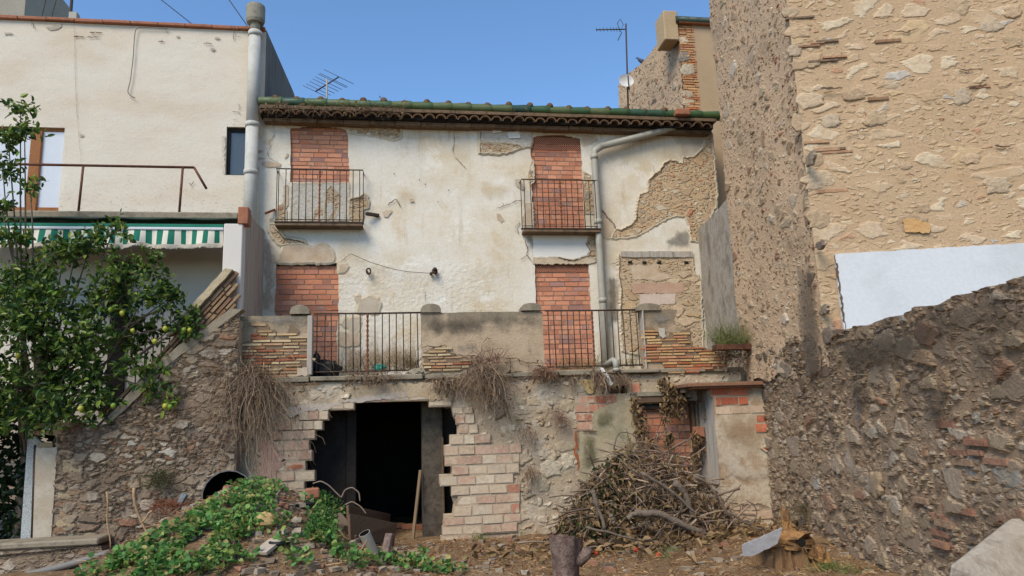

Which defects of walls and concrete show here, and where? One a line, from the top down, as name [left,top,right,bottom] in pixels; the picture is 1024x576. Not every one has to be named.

peeling [266,182,371,275]
spalling [477,130,732,374]
spalling [422,346,481,372]